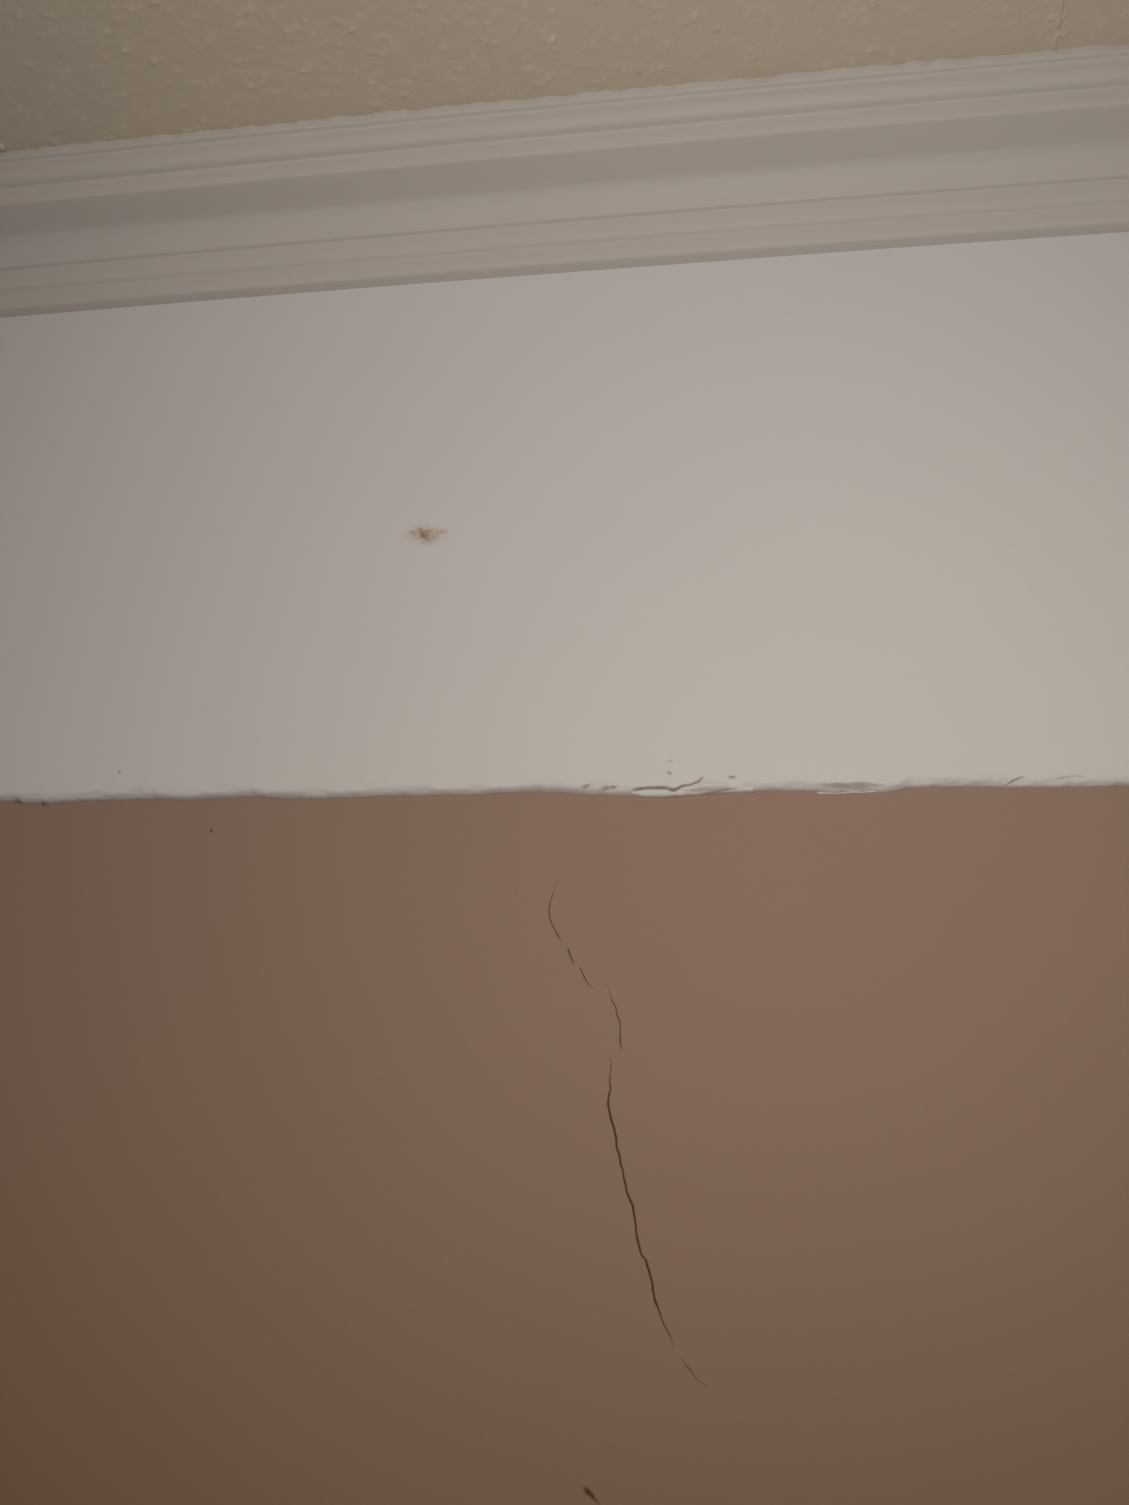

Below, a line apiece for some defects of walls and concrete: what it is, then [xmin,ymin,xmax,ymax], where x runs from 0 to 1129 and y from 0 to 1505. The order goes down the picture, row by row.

crack [607,1013,679,1350]